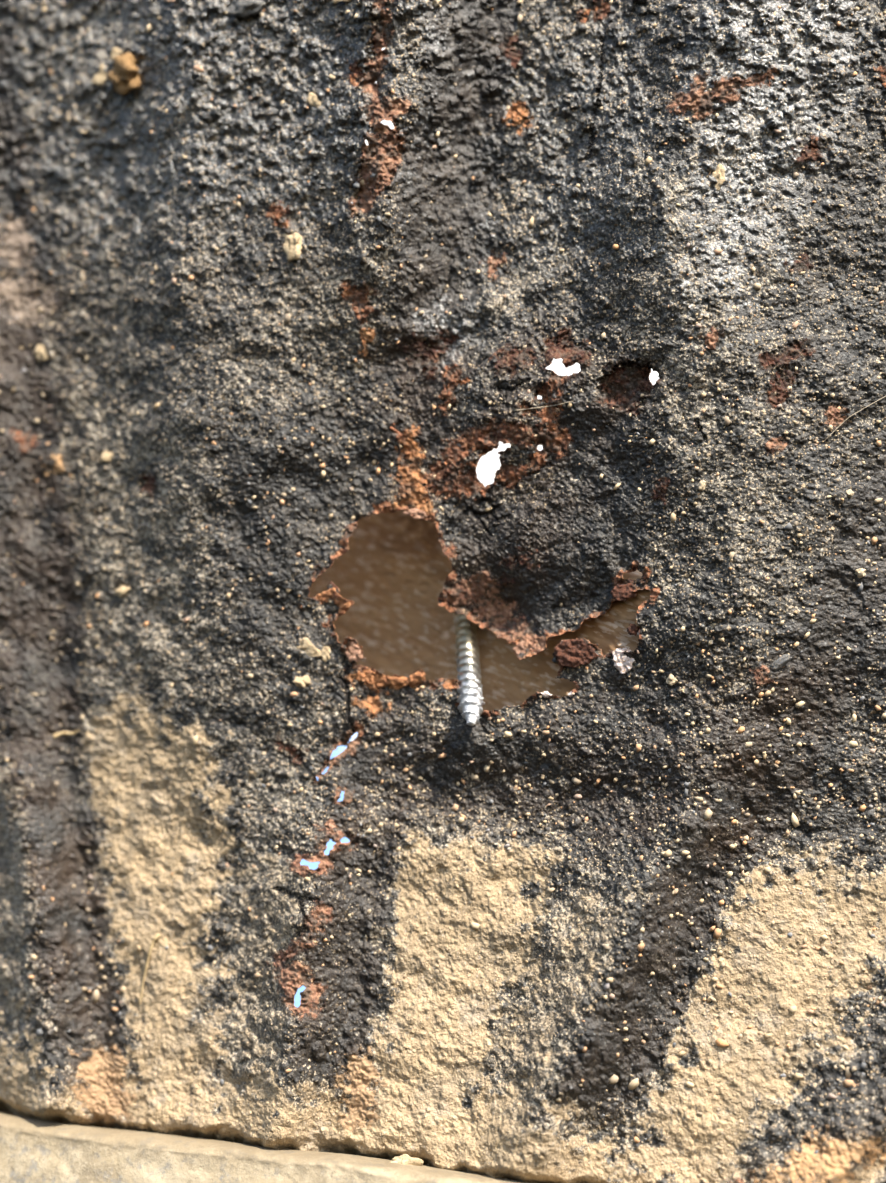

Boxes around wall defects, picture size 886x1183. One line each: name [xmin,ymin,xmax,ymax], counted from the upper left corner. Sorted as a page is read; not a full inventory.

spalling [595,358,656,415]
peeling [403,508,428,519]
peeling [316,581,351,615]
peeling [610,578,641,602]
peeling [627,623,640,636]
peeling [344,638,425,690]
leakage [69,1045,139,1131]
leakage [335,1046,387,1132]